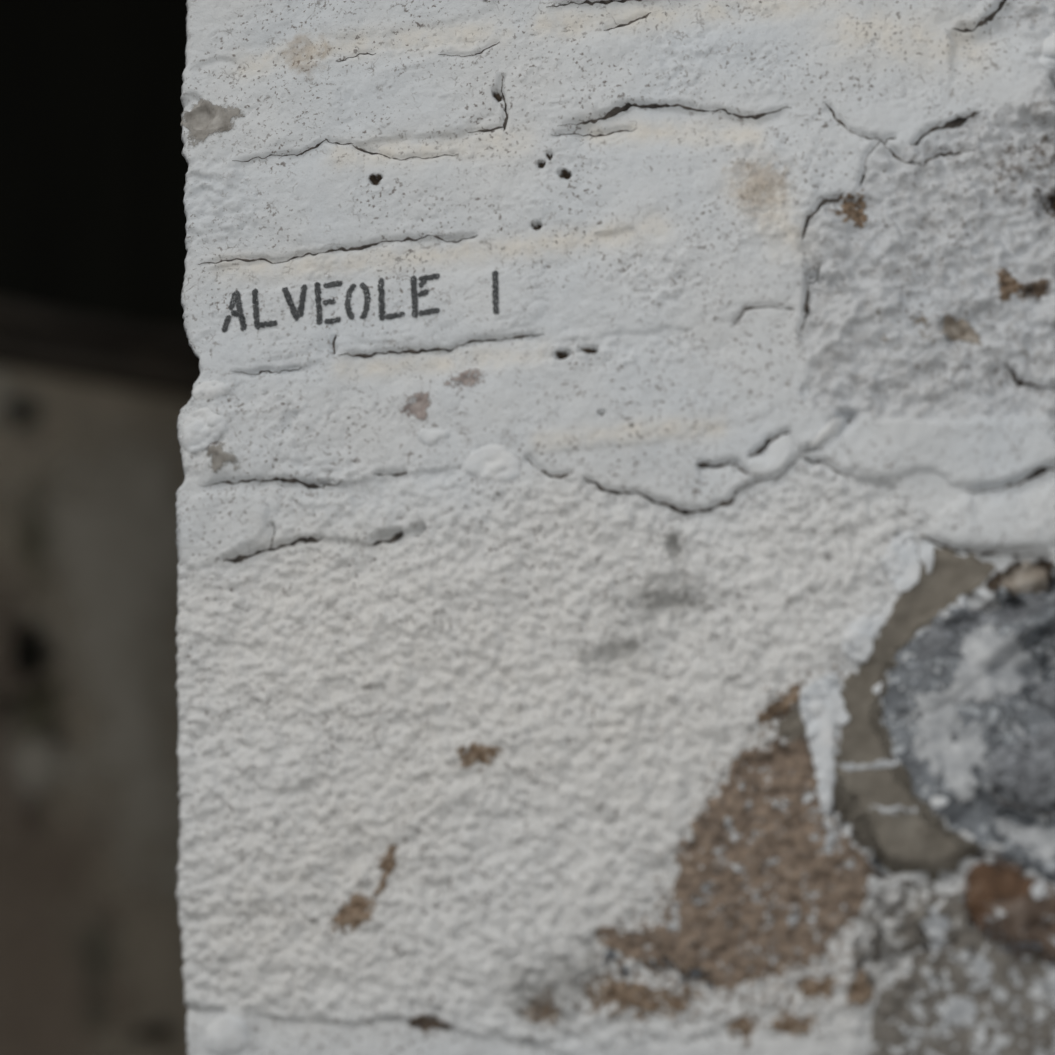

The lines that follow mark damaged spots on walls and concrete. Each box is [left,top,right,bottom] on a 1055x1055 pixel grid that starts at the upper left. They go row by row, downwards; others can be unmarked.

crack [801,101,982,241]
spalling [995,136,1055,218]
crack [732,263,821,338]
spalling [515,531,1055,1055]